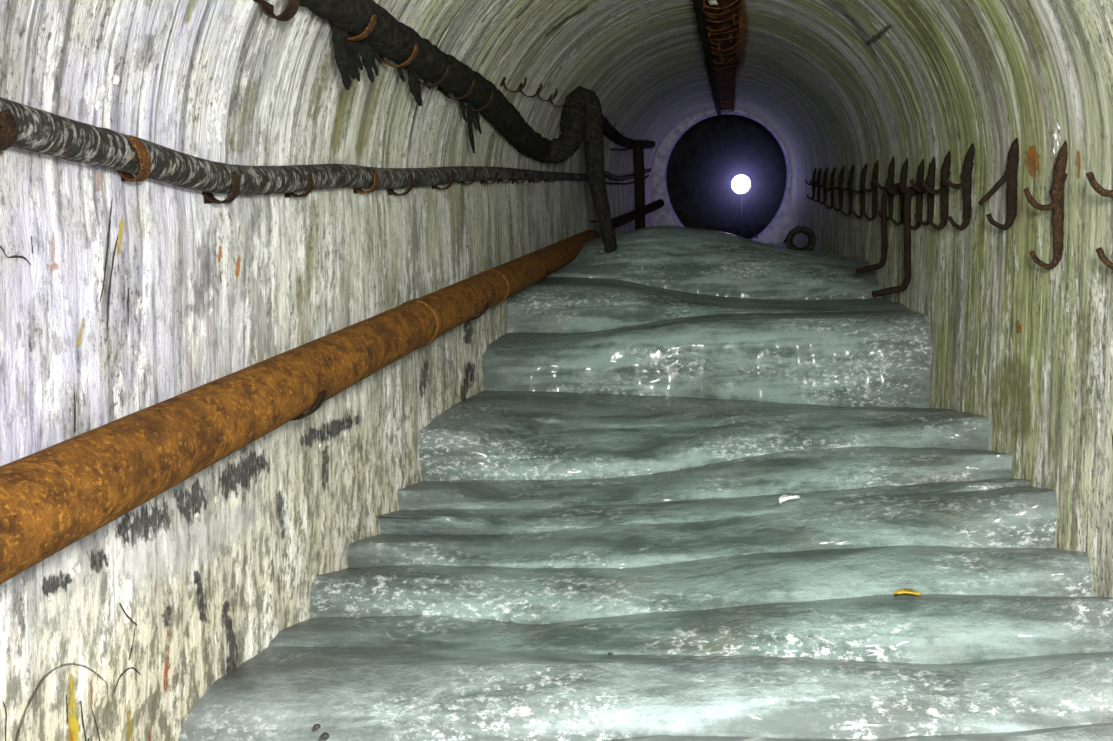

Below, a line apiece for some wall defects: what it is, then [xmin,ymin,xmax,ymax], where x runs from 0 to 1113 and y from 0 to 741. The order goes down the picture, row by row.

corrosion [1024,146,1039,178]
damp [68,674,79,741]